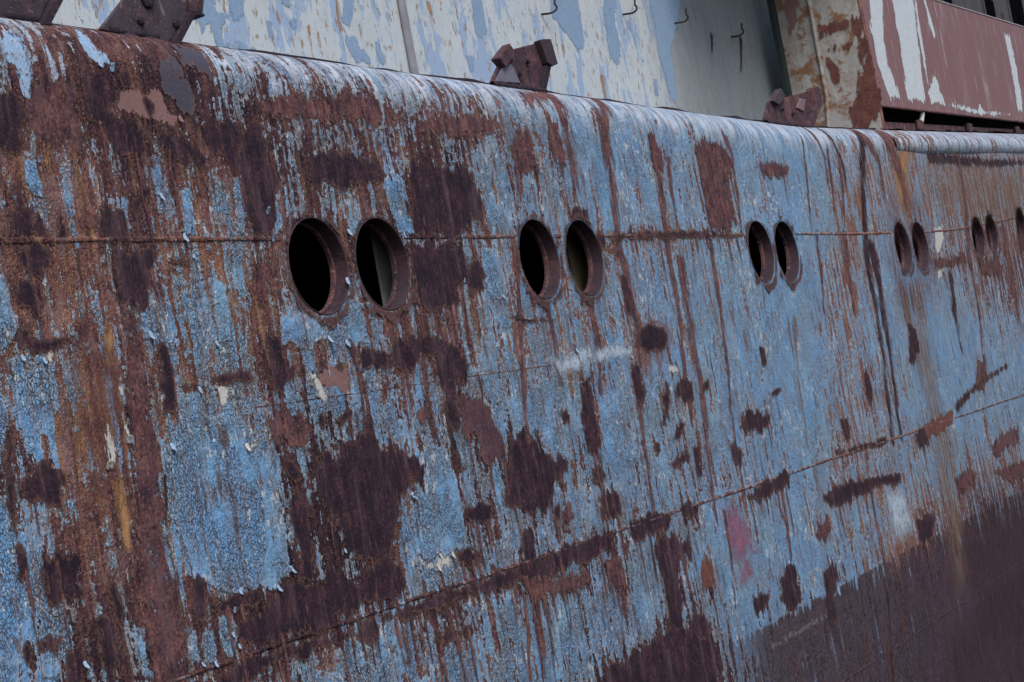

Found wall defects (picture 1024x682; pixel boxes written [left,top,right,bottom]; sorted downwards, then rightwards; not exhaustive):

peeling [196,0,256,50]
peeling [341,0,386,64]
peeling [471,0,487,39]
peeling [550,0,584,52]
peeling [603,0,621,65]
peeling [649,0,680,102]
peeling [869,0,1022,117]
rust [815,14,979,576]
rust [927,153,1024,393]
rust [0,44,802,682]
peeling [167,383,298,595]
rust [824,559,838,626]